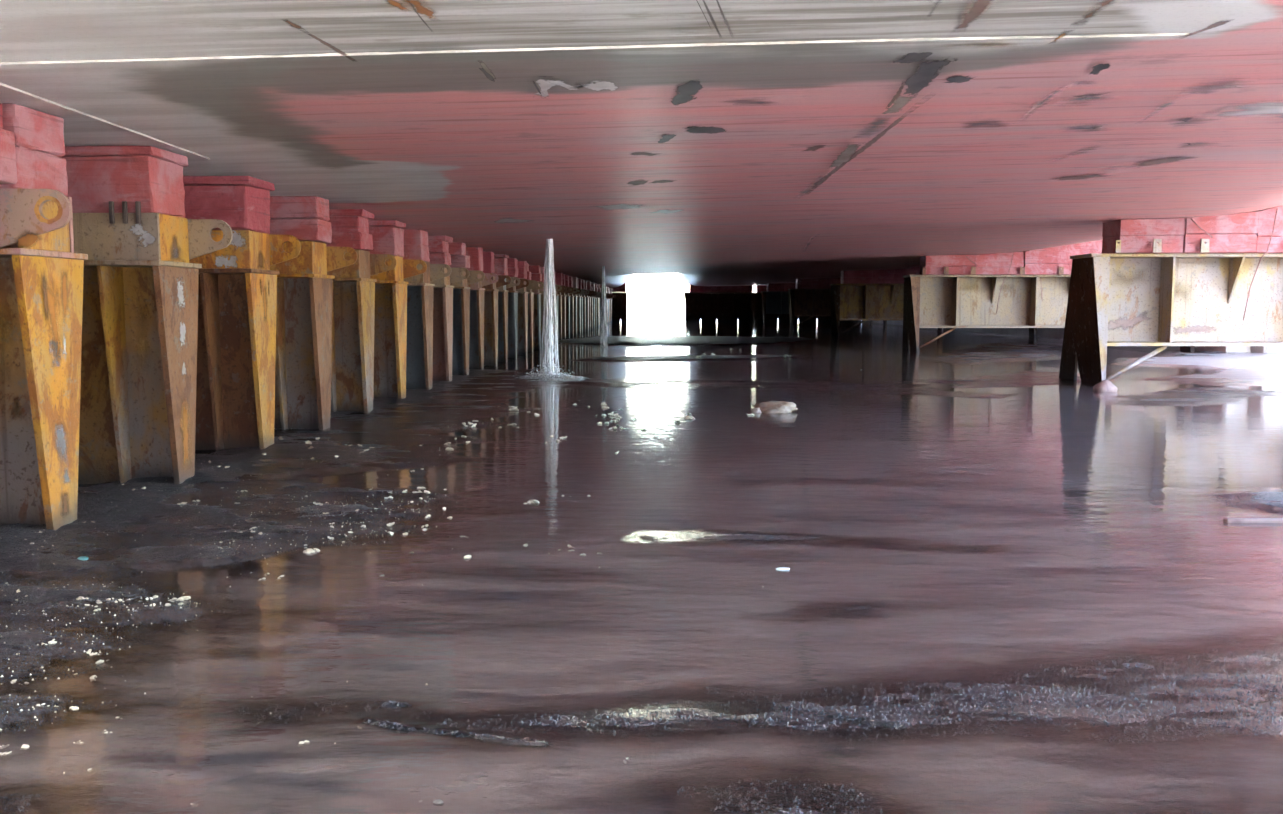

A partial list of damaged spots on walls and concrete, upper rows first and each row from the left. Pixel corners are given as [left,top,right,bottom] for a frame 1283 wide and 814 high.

peeling [534,78,618,98]
spalling [672,80,703,105]
rust [42,273,68,357]
rust [258,253,269,318]